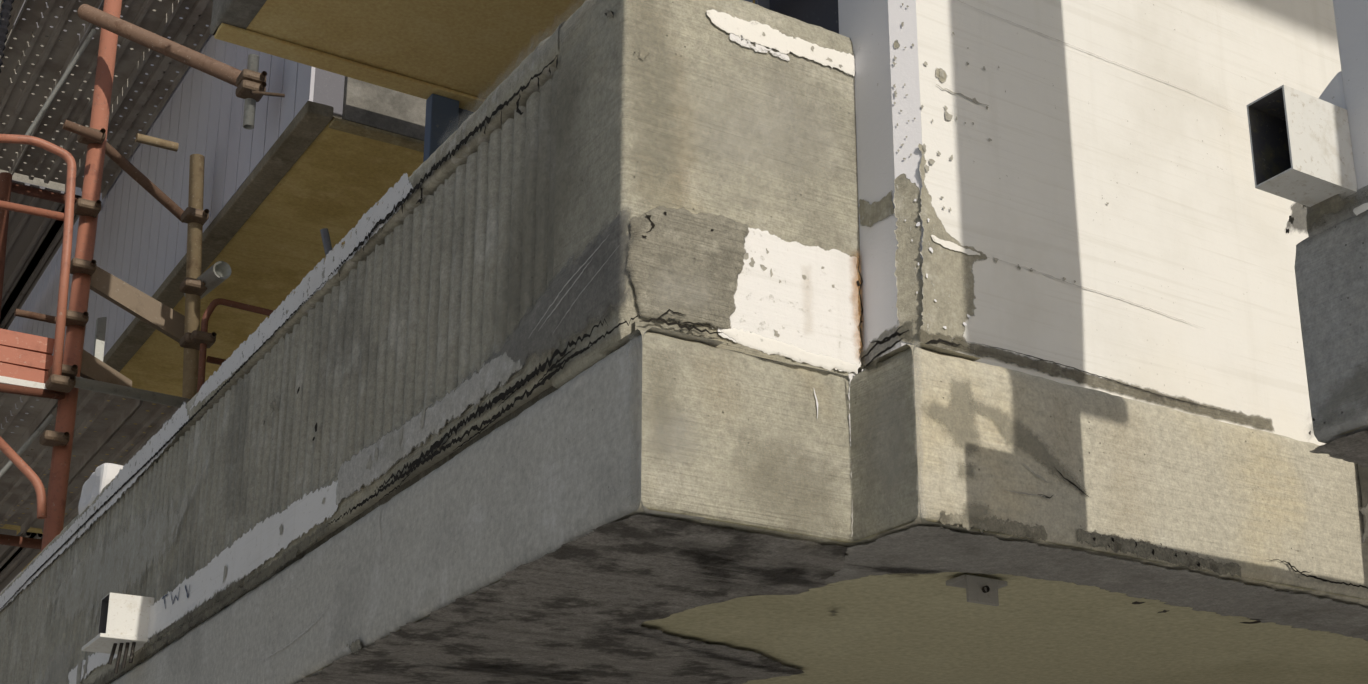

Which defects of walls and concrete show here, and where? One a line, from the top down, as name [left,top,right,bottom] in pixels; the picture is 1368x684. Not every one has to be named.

peeling [706,9,856,76]
peeling [924,61,947,83]
peeling [859,83,987,346]
crack [1,55,558,608]
peeling [718,227,864,373]
crack [326,309,722,527]
crack [814,326,1239,534]
peeling [147,480,338,639]
crack [1267,559,1368,589]
peeling [68,652,117,684]